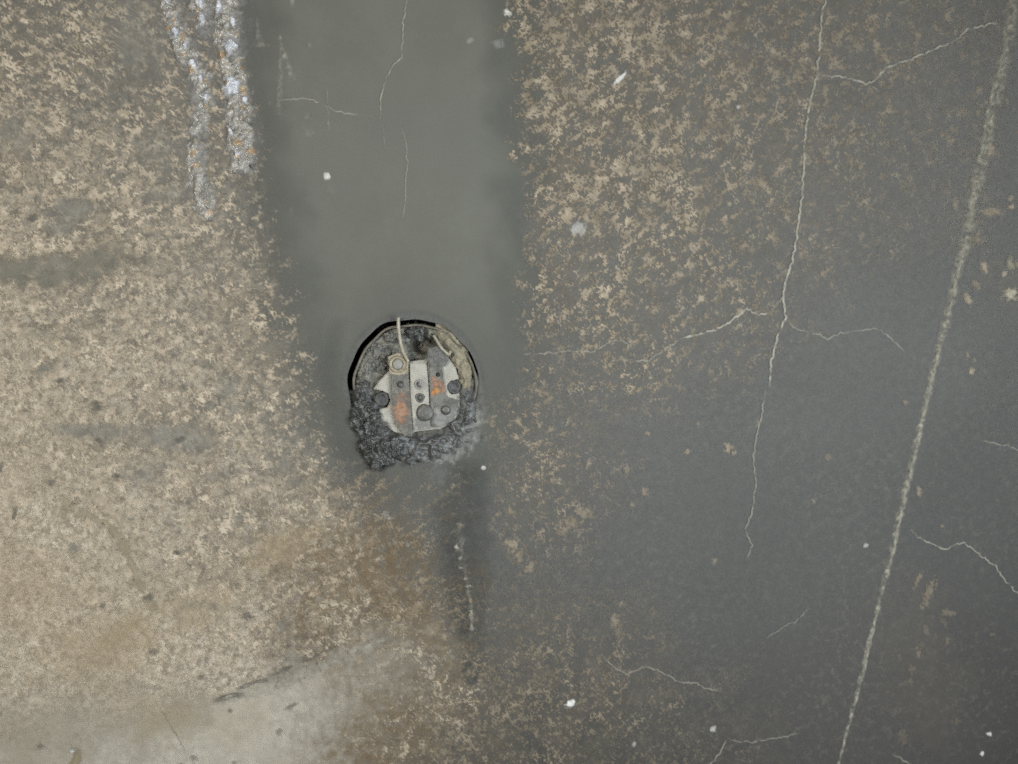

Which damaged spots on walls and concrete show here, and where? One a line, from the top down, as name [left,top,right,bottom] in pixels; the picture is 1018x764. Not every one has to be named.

water stain [188,0,256,174]
crack [575,0,995,456]